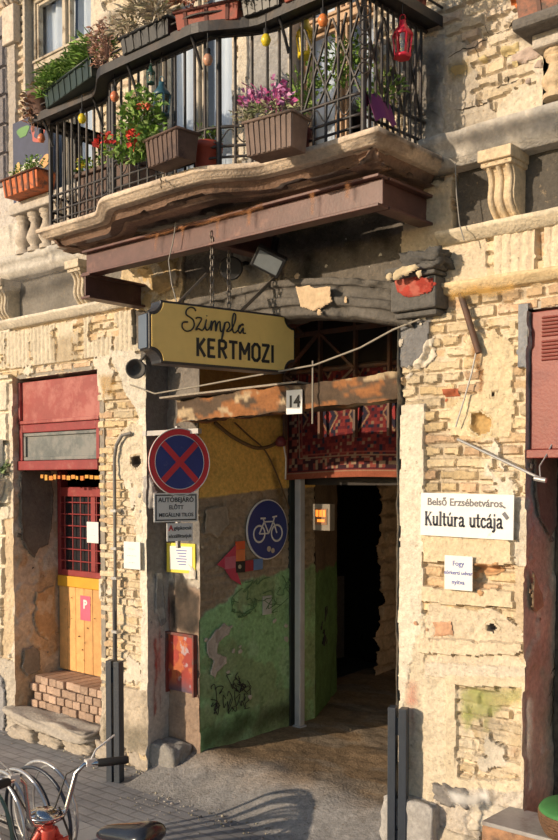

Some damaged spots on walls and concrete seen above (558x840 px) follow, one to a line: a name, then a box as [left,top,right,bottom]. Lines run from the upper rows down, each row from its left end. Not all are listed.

crack [448,20,514,59]
crack [458,76,519,110]
flaking render [294,273,332,315]
peeling [386,264,437,297]
peeling [405,336,437,379]
flaking render [442,388,460,402]
spalling [467,409,493,439]
spalling [129,453,143,471]